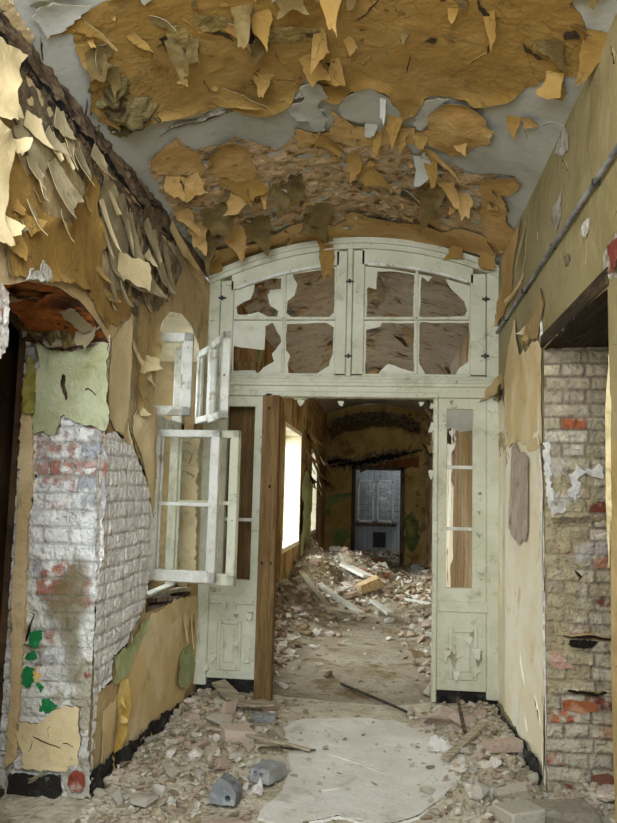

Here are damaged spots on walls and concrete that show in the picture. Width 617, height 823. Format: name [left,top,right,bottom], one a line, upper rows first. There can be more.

peeling [29,0,608,326]
spalling [603,233,617,280]
spalling [0,9,207,799]
peeling [294,397,436,569]
crack [326,447,423,473]
peeling [389,320,414,367]
peeling [442,627,483,682]
peeling [447,428,484,596]
peeling [480,288,614,788]
crack [520,420,611,785]
spalling [492,781,603,823]